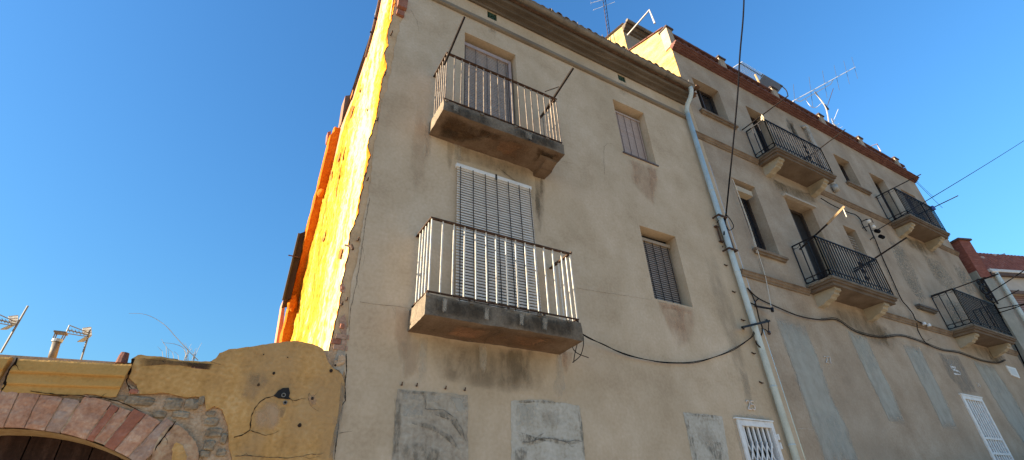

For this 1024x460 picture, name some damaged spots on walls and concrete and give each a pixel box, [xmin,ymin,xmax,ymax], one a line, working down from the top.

flaking render [330,314,349,375]
crack [234,354,350,459]